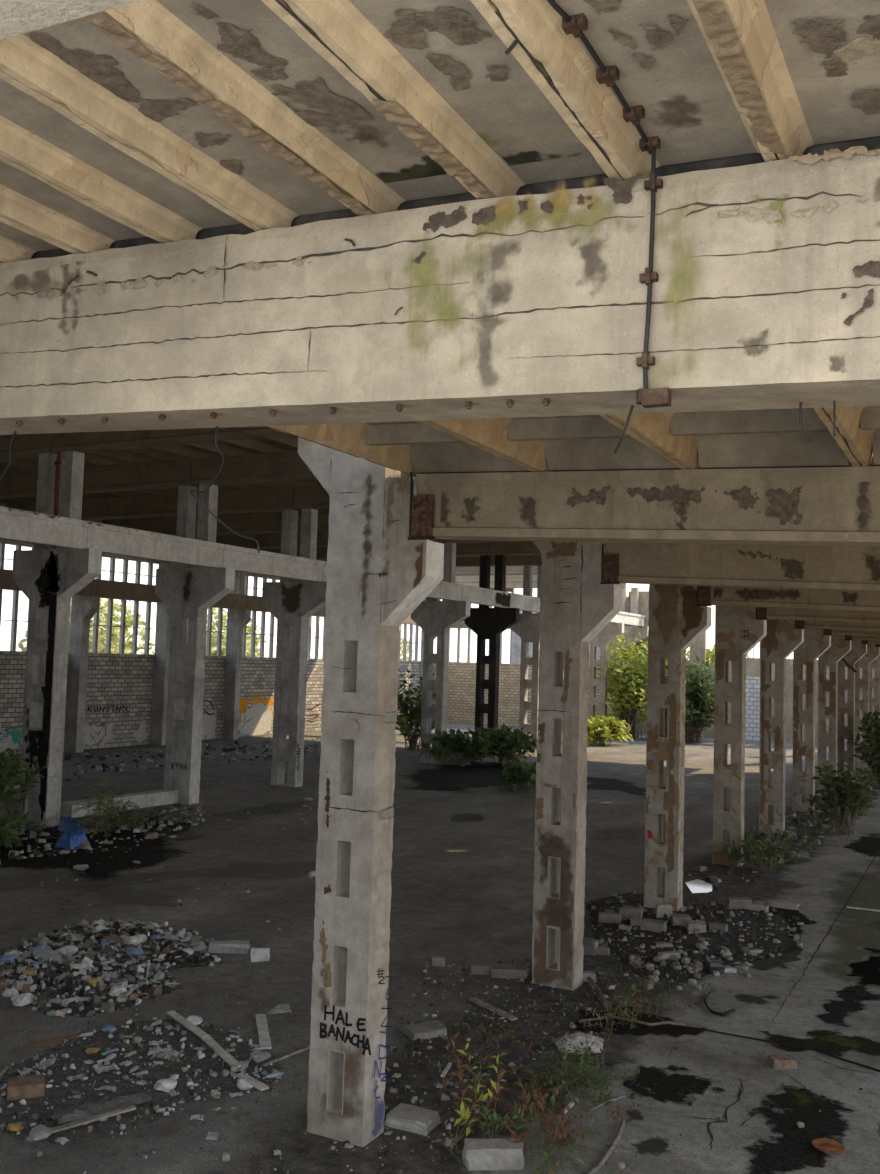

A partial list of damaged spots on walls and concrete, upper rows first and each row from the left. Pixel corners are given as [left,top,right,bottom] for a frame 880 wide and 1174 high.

spalling [29,12,374,216]
peeling [191,3,509,232]
spalling [608,0,880,164]
damp [409,249,457,328]
crack [0,191,880,387]
damp [479,284,510,384]
damp [581,241,606,281]
peeling [566,484,803,525]
damp [0,551,199,882]
peeling [760,619,835,825]
damp [761,948,880,1056]
crack [685,1079,761,1150]